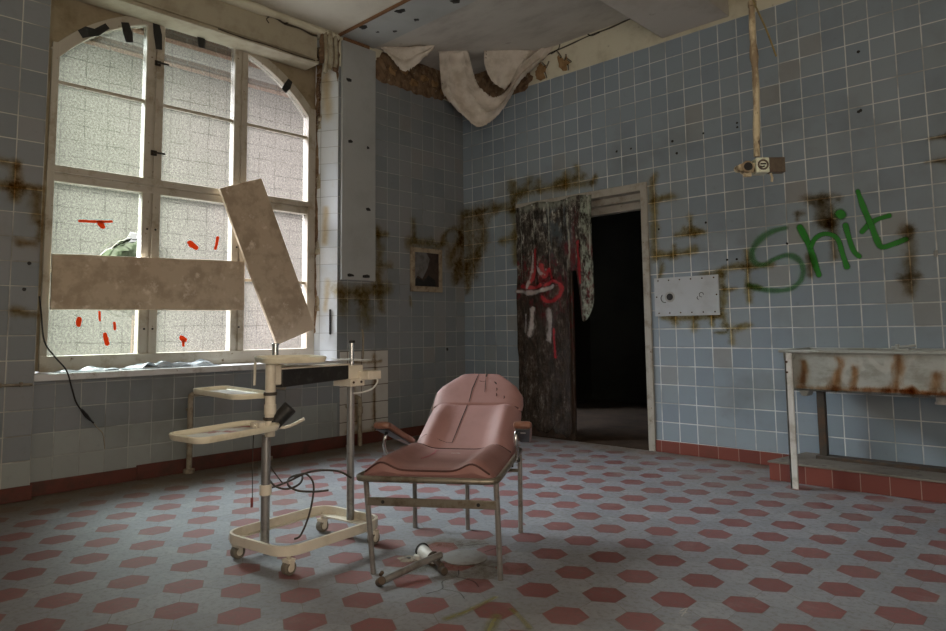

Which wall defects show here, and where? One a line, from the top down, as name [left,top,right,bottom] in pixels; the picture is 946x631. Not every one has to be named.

spalling [376,52,447,101]
spalling [474,51,572,97]